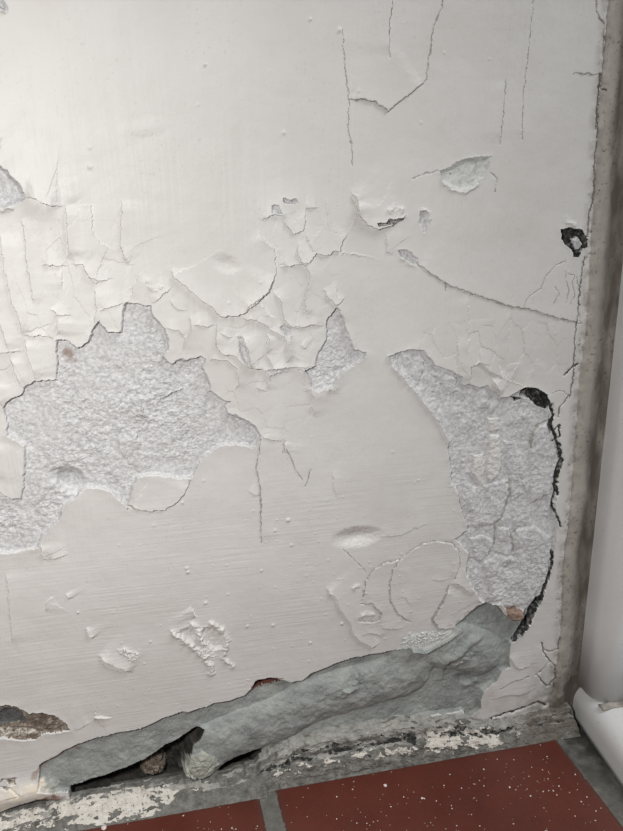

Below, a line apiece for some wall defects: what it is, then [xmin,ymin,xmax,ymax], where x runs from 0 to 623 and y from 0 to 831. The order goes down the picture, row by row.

crack [342,0,443,166]
peeling [412,156,498,194]
peeling [377,215,406,227]
crack [416,0,607,527]
spalling [561,214,588,257]
peeling [0,187,367,554]
spalling [37,349,560,797]
crack [343,540,461,622]
crack [527,549,554,625]
crack [489,636,561,719]
peeling [0,705,115,740]
water stain [0,777,62,812]